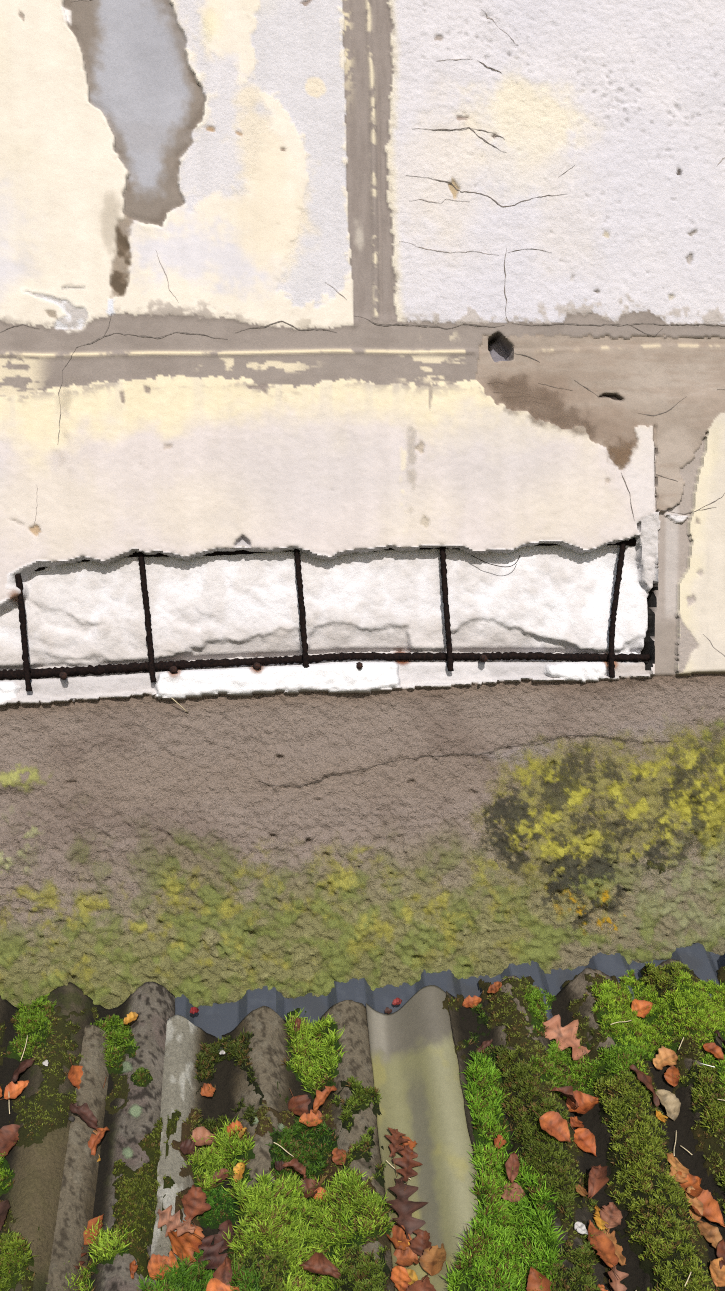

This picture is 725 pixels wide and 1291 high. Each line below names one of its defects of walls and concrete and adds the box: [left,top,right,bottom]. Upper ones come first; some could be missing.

flaking render [63,0,351,317]
crack [415,127,507,153]
spalling [0,513,702,707]